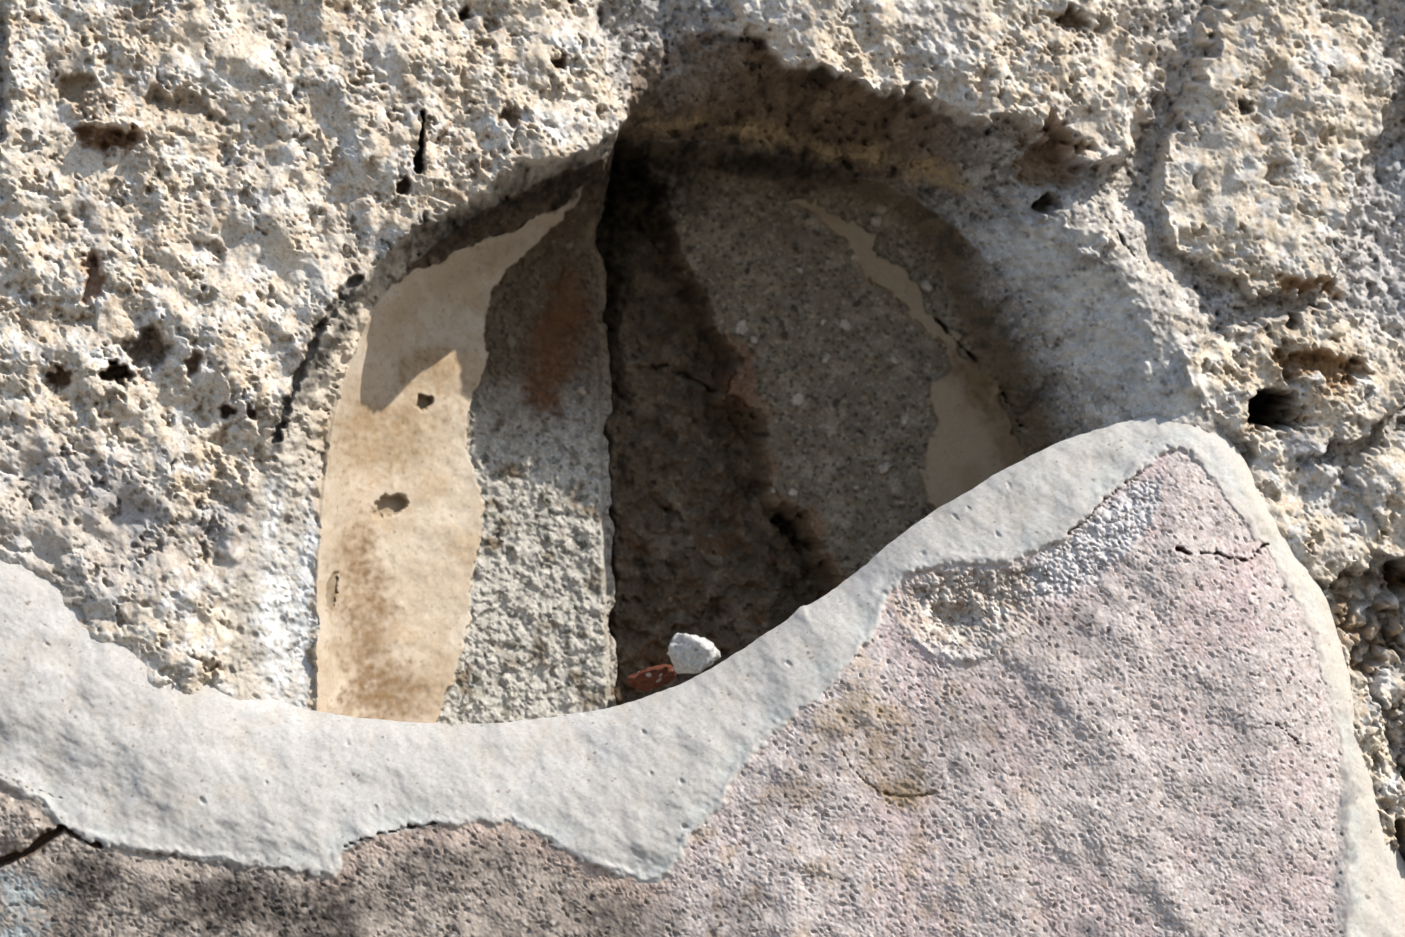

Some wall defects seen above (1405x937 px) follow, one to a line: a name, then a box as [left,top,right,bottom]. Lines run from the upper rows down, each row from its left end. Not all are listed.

hole [550,51,569,74]
hole [496,102,524,135]
hole [395,175,413,196]
hole [1031,192,1063,219]
hole [416,393,434,412]
flaking render [436,146,1032,724]
hole [371,493,410,520]
spalling [892,477,1167,657]
crack [1175,543,1269,564]
spalling [316,570,340,640]
crack [0,774,104,869]